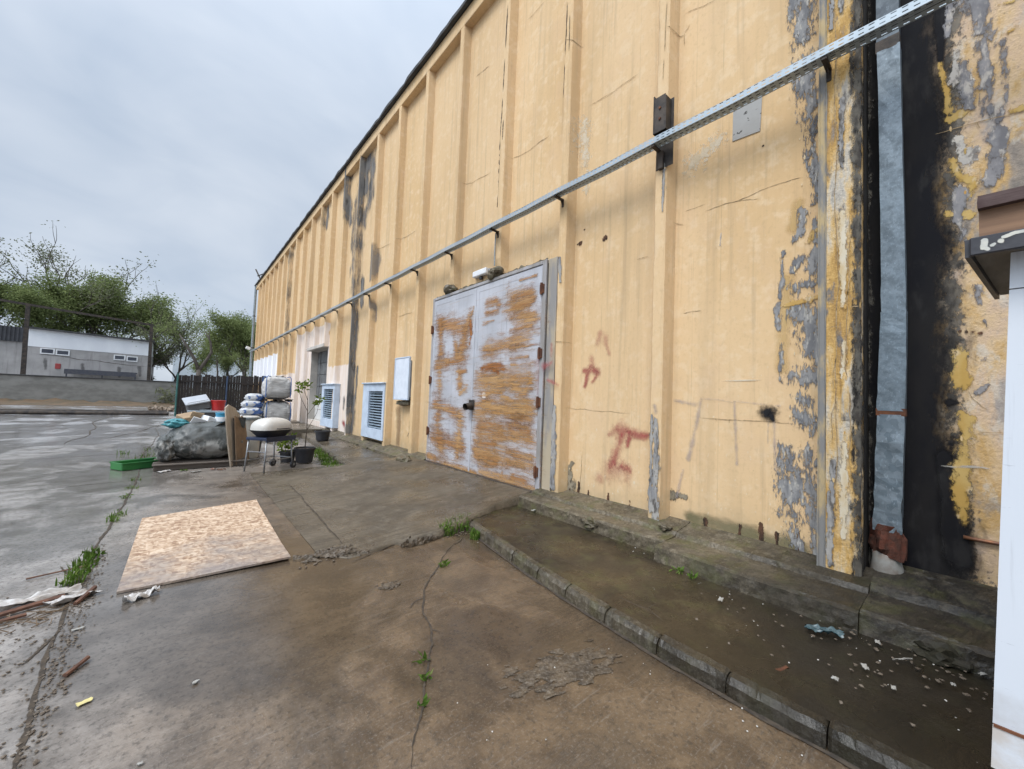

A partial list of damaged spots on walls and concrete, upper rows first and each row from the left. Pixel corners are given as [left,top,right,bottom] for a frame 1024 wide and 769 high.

peeling [937,49,981,220]
damp [332,147,381,434]
rust [427,273,540,490]
peeling [647,412,688,521]
peeling [772,0,849,568]
damp [900,0,1010,587]
peeling [948,347,974,392]
peeling [948,410,989,524]
crack [410,533,465,764]
spalling [496,639,623,700]